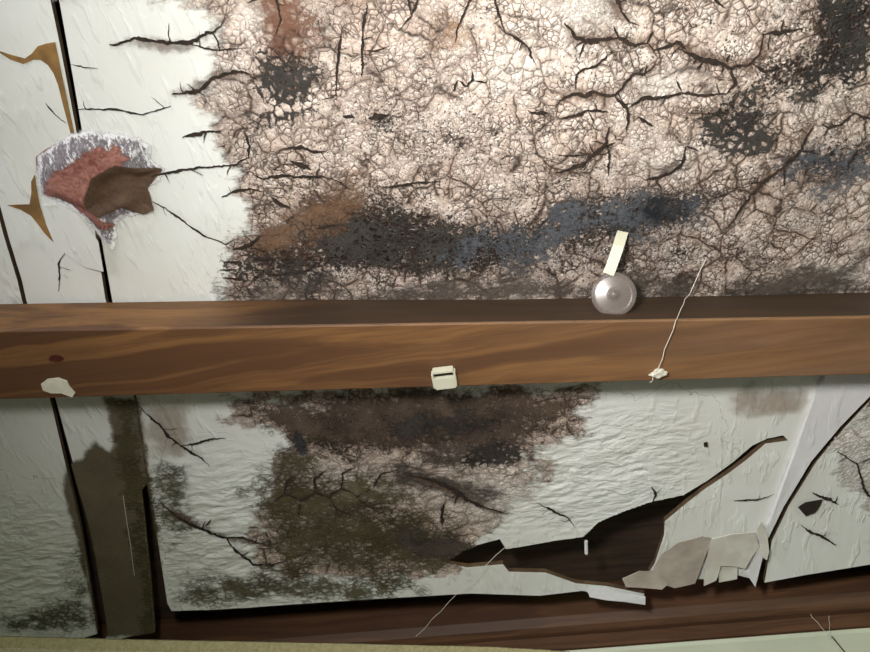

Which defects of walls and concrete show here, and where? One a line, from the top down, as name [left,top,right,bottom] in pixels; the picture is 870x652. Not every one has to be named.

crack [46,18,257,122]
crack [182,130,221,143]
crack [151,132,349,209]
crack [322,0,419,120]
crack [494,0,536,65]
leakage [179,0,870,301]
crack [528,0,802,175]
crack [727,112,870,228]
crack [160,503,290,567]
leakage [176,382,599,607]
peeling [622,521,769,590]
leakage [825,401,870,511]